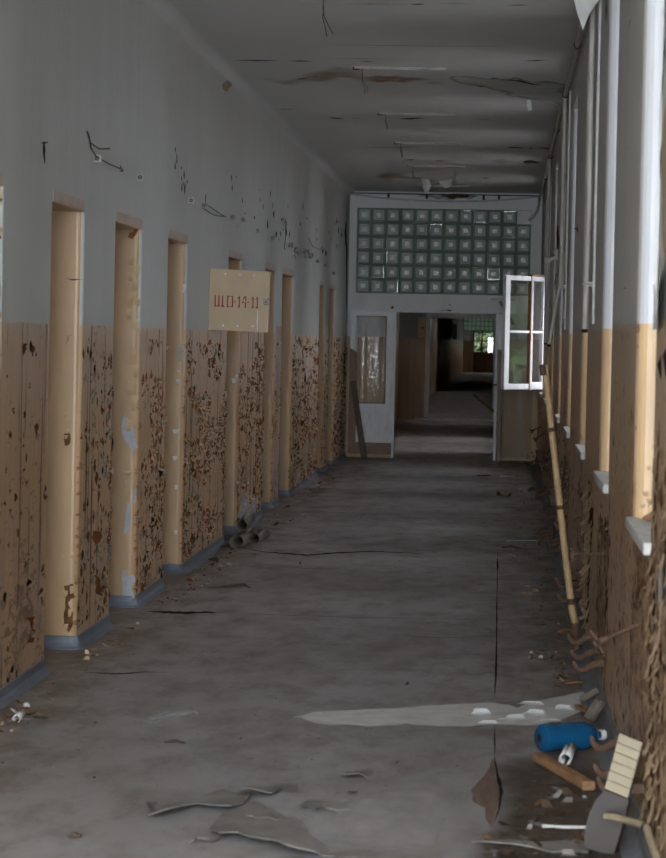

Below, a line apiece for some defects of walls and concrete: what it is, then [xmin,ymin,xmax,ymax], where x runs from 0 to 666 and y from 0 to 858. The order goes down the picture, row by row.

peeling [451,76,565,104]
peeling [62,335,348,633]
peeling [536,365,666,858]
spalling [655,345,666,385]